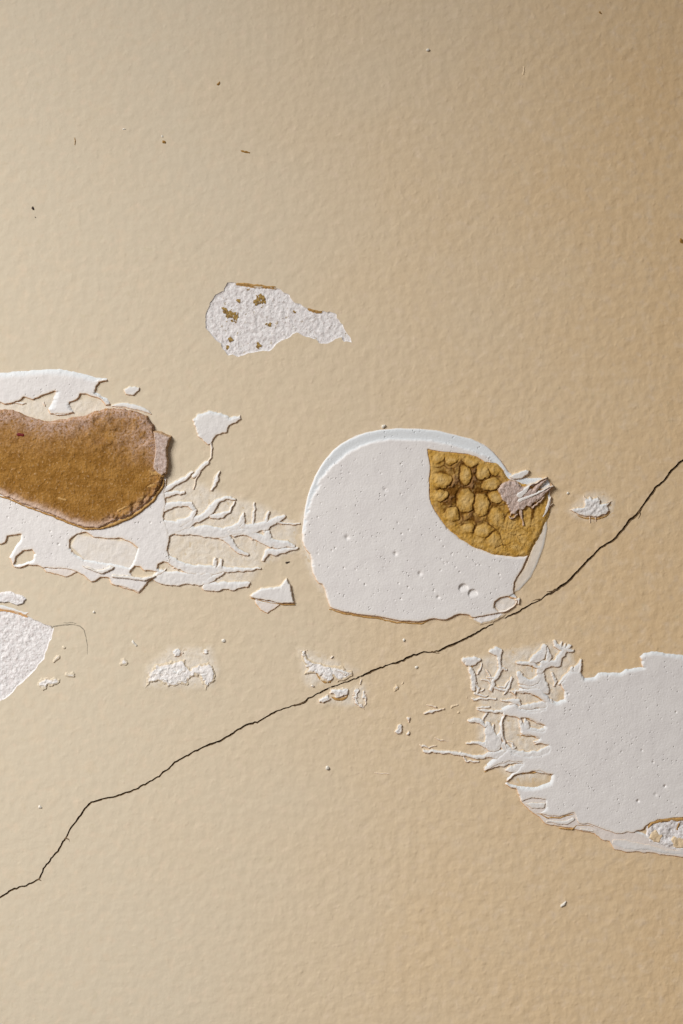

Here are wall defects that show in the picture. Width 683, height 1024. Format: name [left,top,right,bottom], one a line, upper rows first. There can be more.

peeling [205,282,351,357]
peeling [0,369,619,625]
peeling [0,591,54,701]
crack [0,459,683,898]
peeling [422,638,683,858]